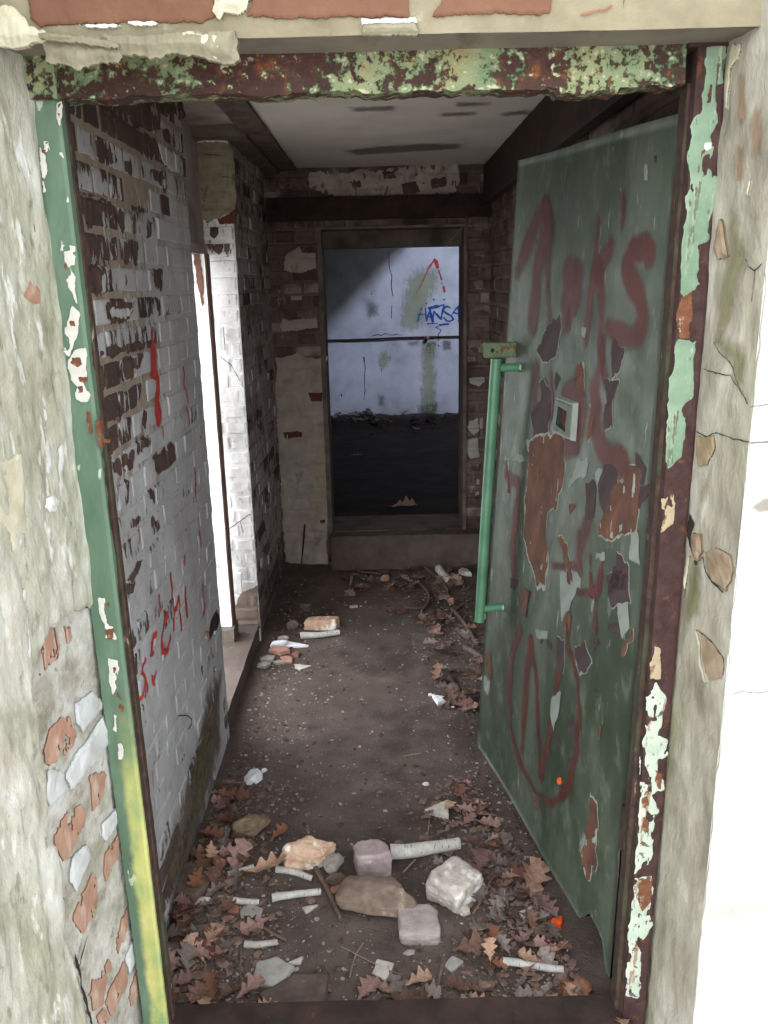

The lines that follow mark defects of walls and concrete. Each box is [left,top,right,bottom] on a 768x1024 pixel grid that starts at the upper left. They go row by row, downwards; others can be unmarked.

flaking render [0,0,418,73]
flaking render [308,164,460,196]
peeling [60,101,186,402]
rust [676,292,693,339]
crack [703,341,768,407]
peeling [110,401,176,504]
crack [696,431,768,444]
peeling [585,453,650,609]
flaking render [683,513,735,593]
peeling [98,598,117,640]
flaking render [42,658,124,933]
flaking render [87,905,140,1024]